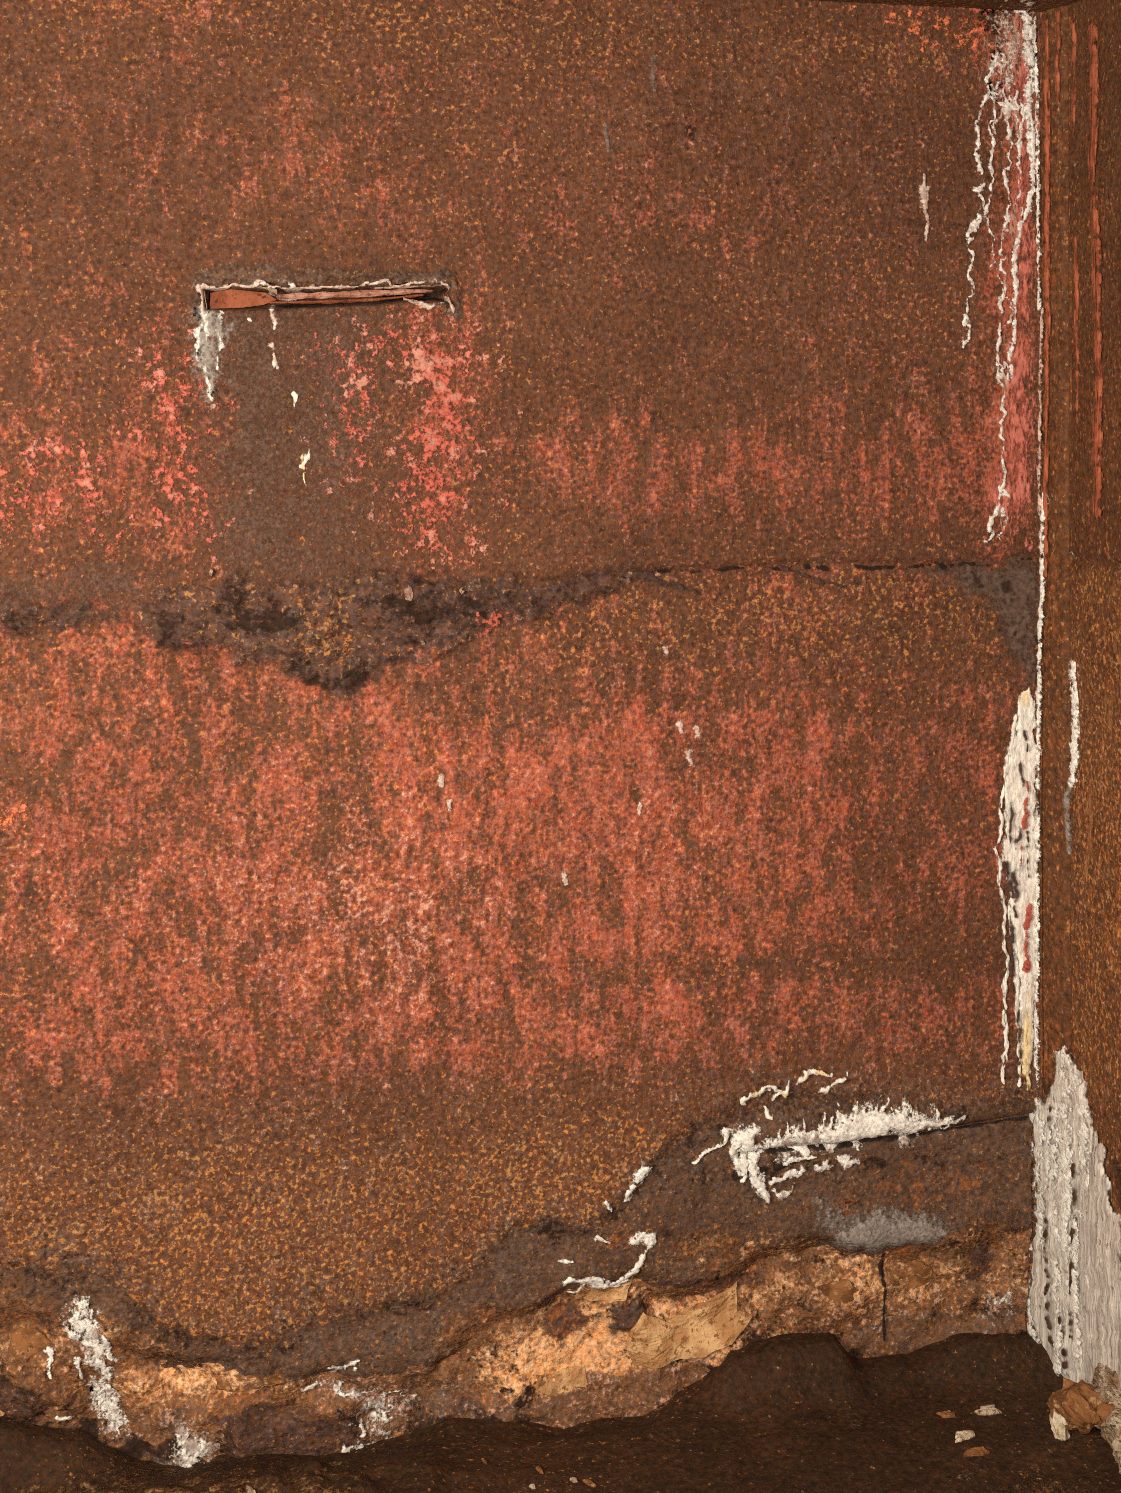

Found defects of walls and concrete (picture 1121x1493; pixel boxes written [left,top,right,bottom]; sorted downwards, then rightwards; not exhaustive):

water stain [192,304,379,574]
crack [594,557,1030,596]
water stain [928,0,1045,1091]
water stain [1063,661,1080,854]
water stain [692,1069,965,1203]
spalling [0,1046,1121,1464]
water stain [44,1347,54,1379]
water stain [63,1295,130,1439]